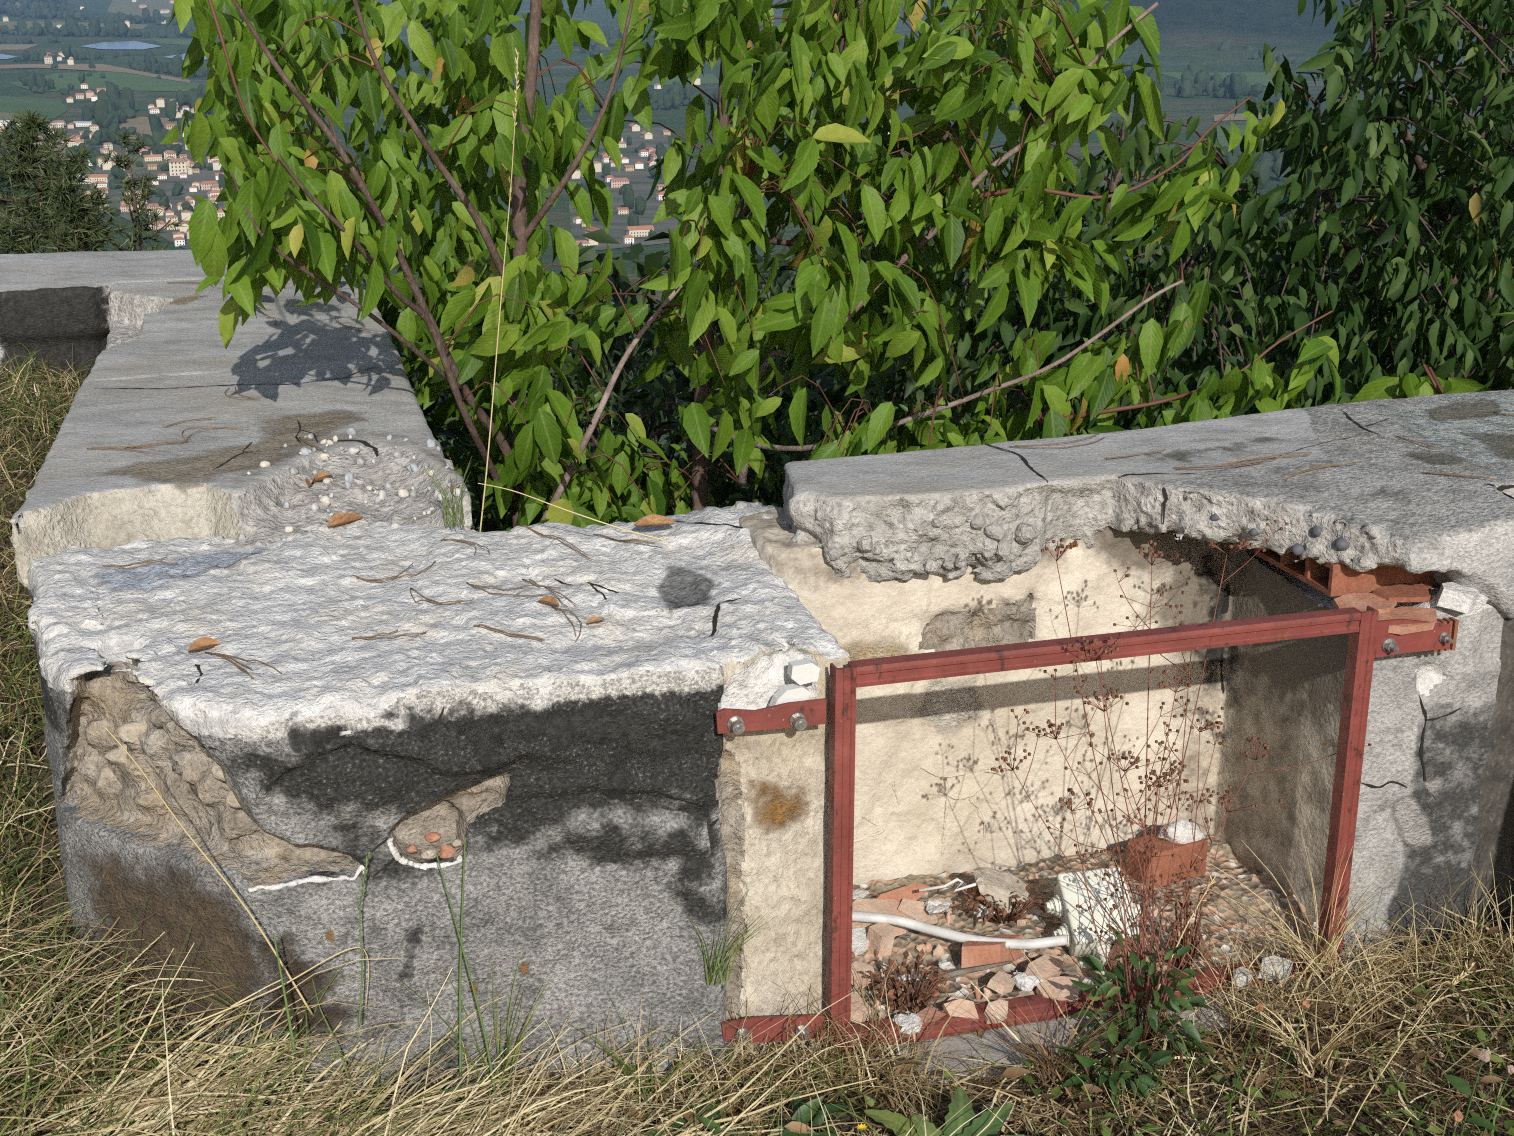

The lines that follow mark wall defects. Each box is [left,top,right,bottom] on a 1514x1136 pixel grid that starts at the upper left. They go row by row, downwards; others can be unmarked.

crack [985,443,1048,482]
crack [1484,483,1514,499]
spalling [8,442,1405,893]
crack [411,707,719,827]
corrosion [753,783,806,830]